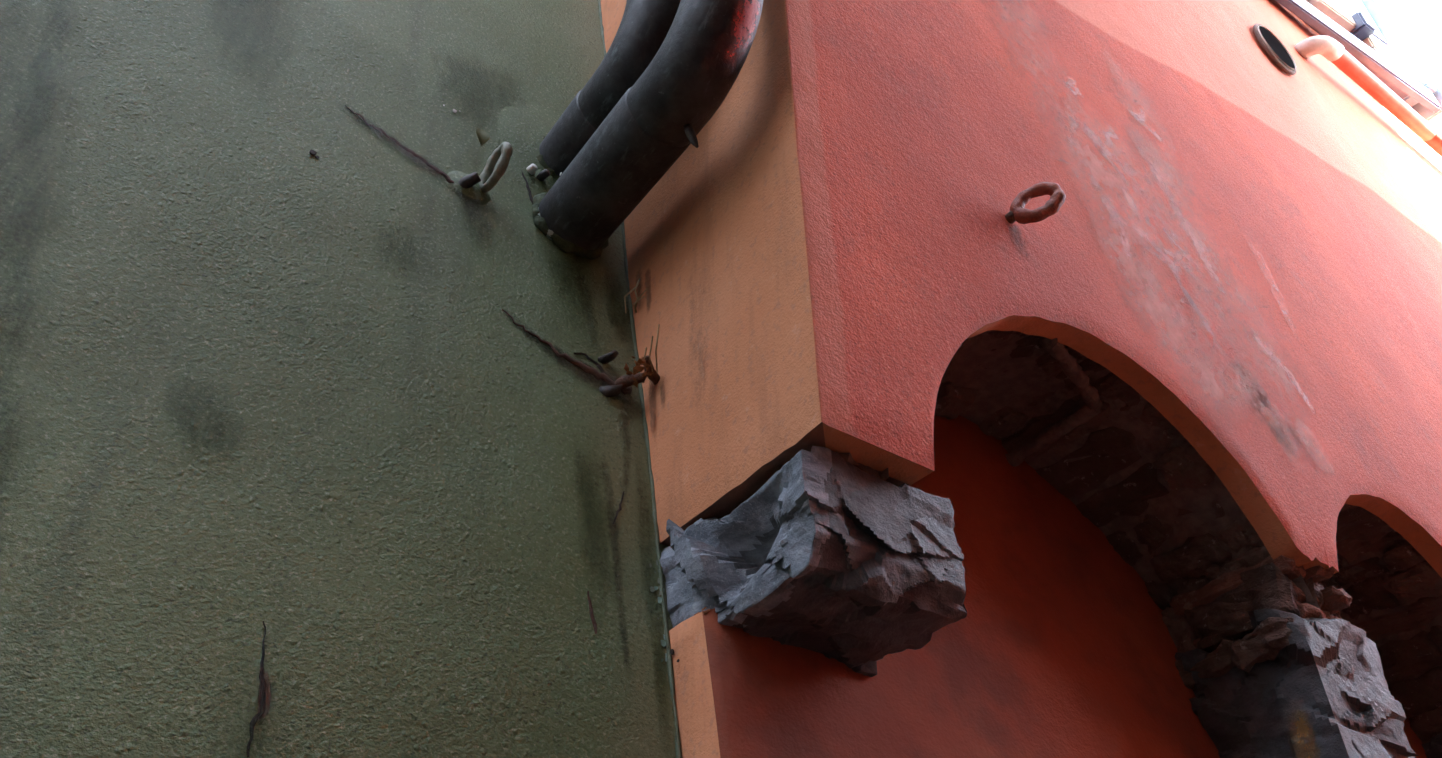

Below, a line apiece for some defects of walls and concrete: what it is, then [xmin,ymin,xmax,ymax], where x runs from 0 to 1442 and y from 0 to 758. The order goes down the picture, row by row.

crack [246,621,271,757]